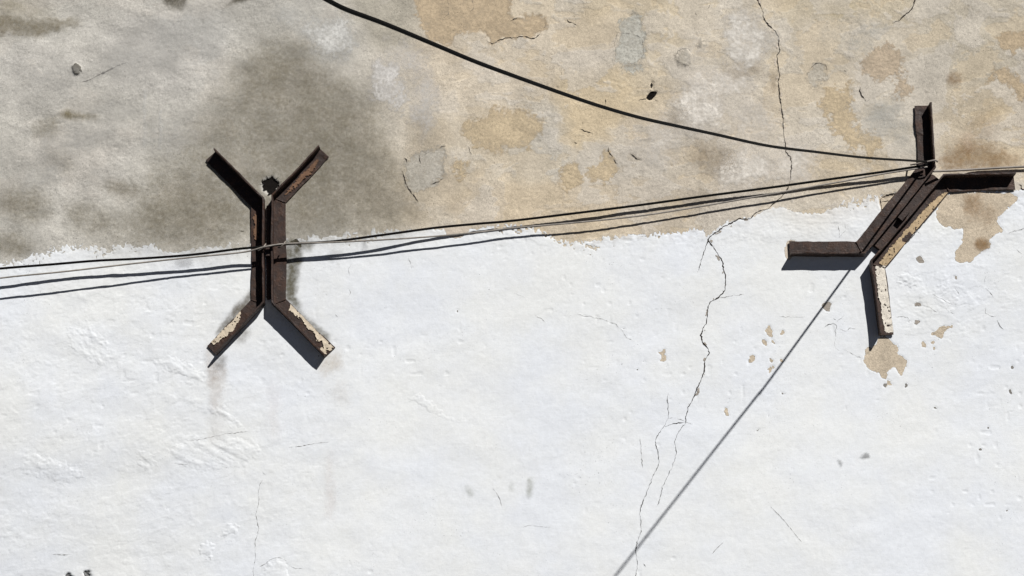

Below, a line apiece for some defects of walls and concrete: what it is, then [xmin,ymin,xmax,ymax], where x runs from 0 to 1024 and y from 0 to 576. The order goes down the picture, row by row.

leakage [372,53,434,124]
peeling [415,0,547,46]
peeling [463,104,542,153]
flaking render [615,14,646,74]
peeling [807,62,882,162]
peeling [862,43,914,100]
peeling [262,159,319,195]
flaking render [403,145,469,192]
peeling [558,150,618,192]
peeling [444,226,470,238]
crack [635,0,792,576]
peeling [863,192,1018,388]